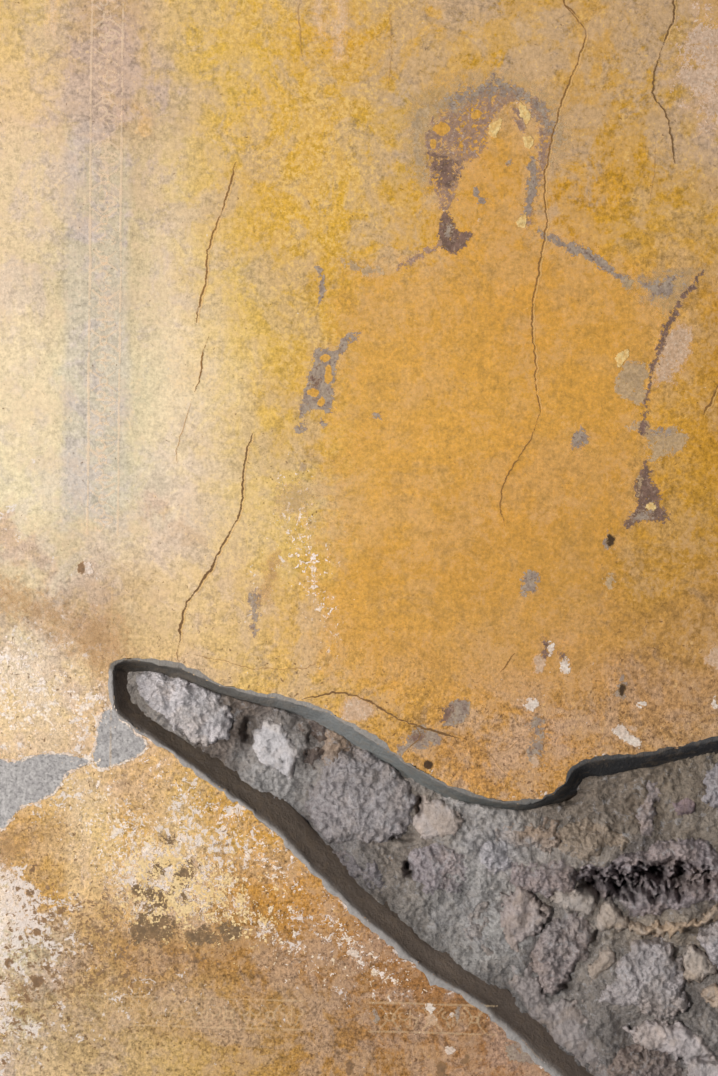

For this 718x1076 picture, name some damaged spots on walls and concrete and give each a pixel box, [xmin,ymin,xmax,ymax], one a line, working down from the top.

crack [175,162,236,461]
crack [499,0,586,523]
crack [648,0,675,203]
spalling [0,658,718,1076]